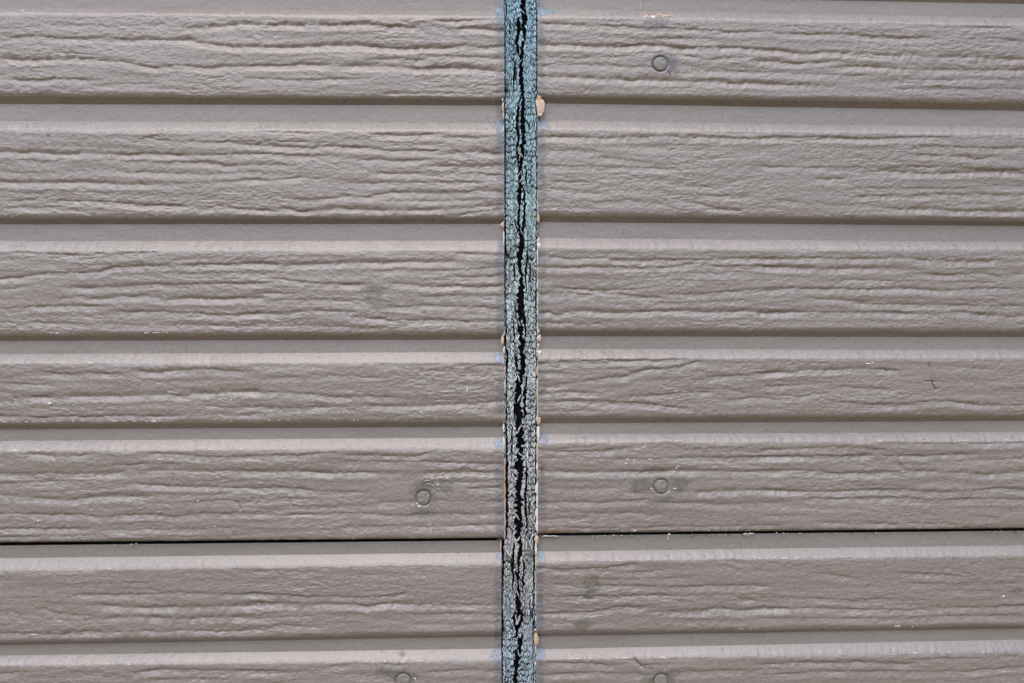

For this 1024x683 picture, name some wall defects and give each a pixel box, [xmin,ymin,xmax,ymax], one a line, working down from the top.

crack [501,0,537,683]